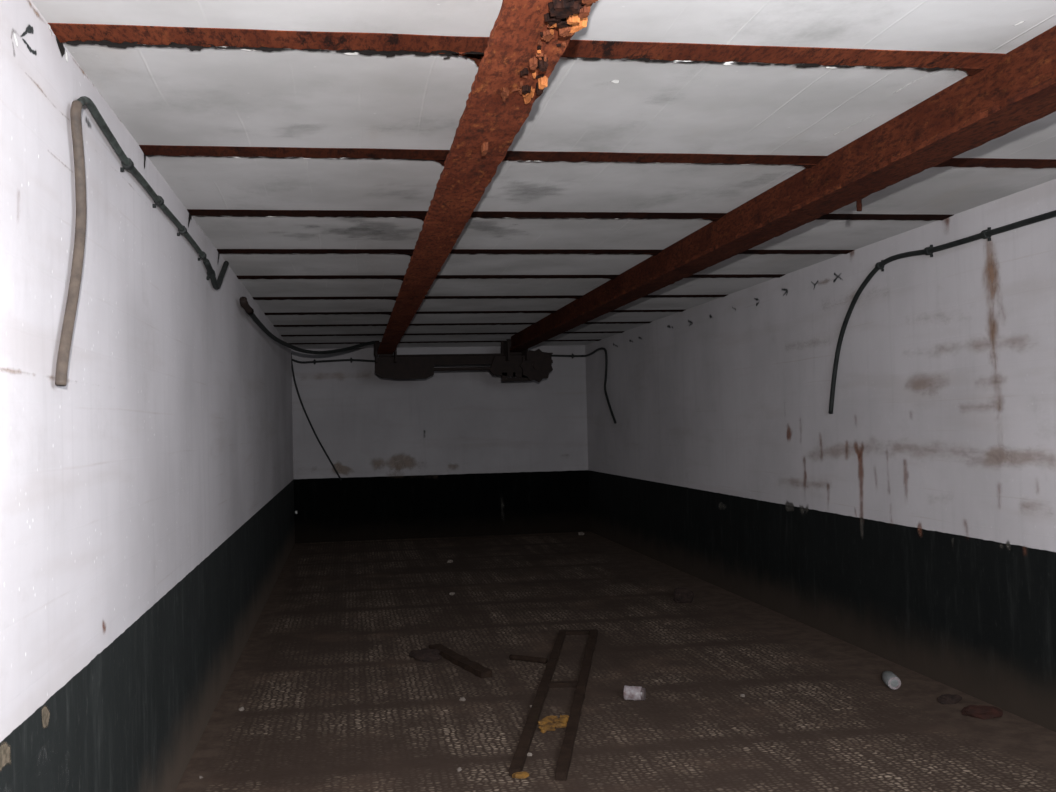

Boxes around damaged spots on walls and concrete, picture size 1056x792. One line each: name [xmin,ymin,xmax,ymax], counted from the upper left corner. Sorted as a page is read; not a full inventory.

corrosion [500,0,598,104]
corrosion [987,254,996,296]
corrosion [846,443,864,537]
peeling [42,706,50,728]
peeling [0,743,11,771]